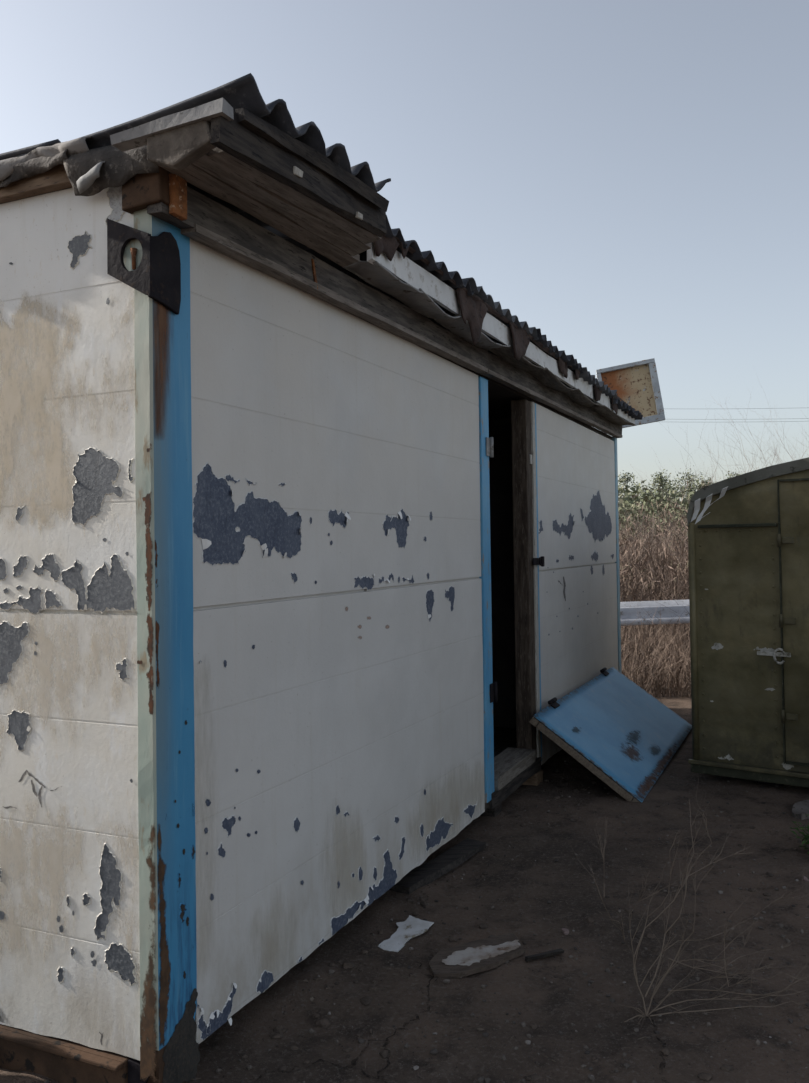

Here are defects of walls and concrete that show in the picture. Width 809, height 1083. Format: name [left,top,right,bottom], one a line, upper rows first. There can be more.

peeling [67,230,92,270]
damp [0,298,96,530]
rust [147,301,169,452]
peeling [71,447,135,527]
peeling [192,462,312,567]
peeling [538,490,614,576]
peeling [0,552,136,686]
rust [137,492,160,715]
peeling [6,709,31,752]
peeling [56,843,137,986]
rust [140,826,171,1081]
peeling [162,983,237,1083]